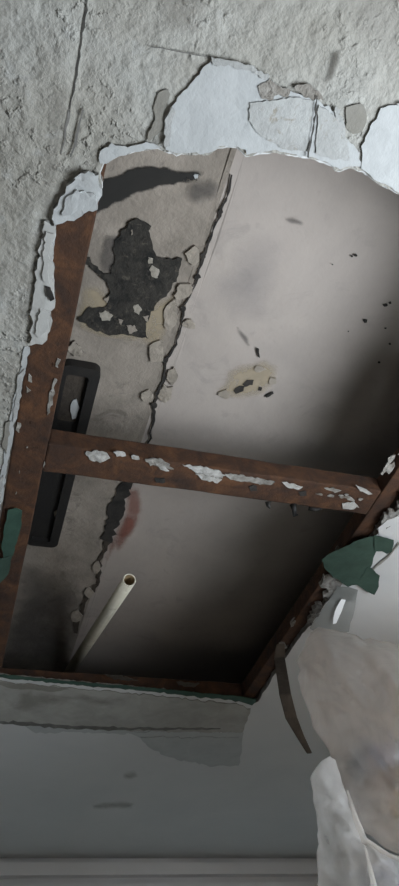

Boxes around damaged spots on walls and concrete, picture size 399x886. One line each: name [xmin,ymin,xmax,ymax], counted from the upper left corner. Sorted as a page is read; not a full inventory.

crack [60,0,88,157]
crack [307,95,318,158]
crack [141,175,232,444]
peeling [0,56,399,510]
crack [71,482,133,633]
flaking render [307,574,342,624]
flaking render [375,500,399,530]